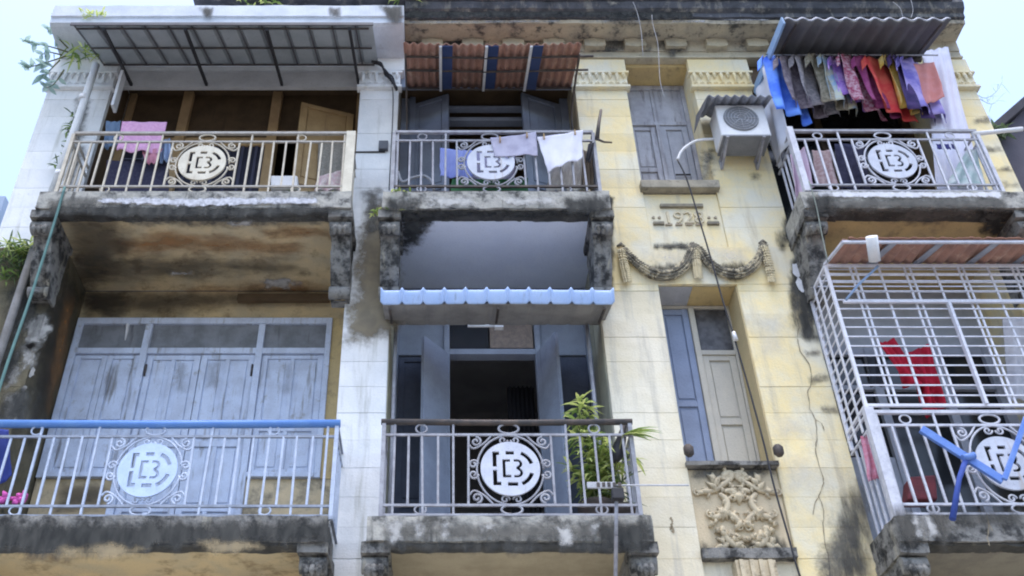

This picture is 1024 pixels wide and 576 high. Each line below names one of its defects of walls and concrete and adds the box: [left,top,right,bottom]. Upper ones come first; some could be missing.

damp [89,294,237,312]
damp [49,198,340,283]
damp [230,264,302,289]
damp [347,189,613,341]
mould [780,211,792,249]
damp [790,260,818,354]
crack [797,318,830,572]
damp [0,518,335,558]
damp [384,520,648,554]
damp [821,485,870,576]